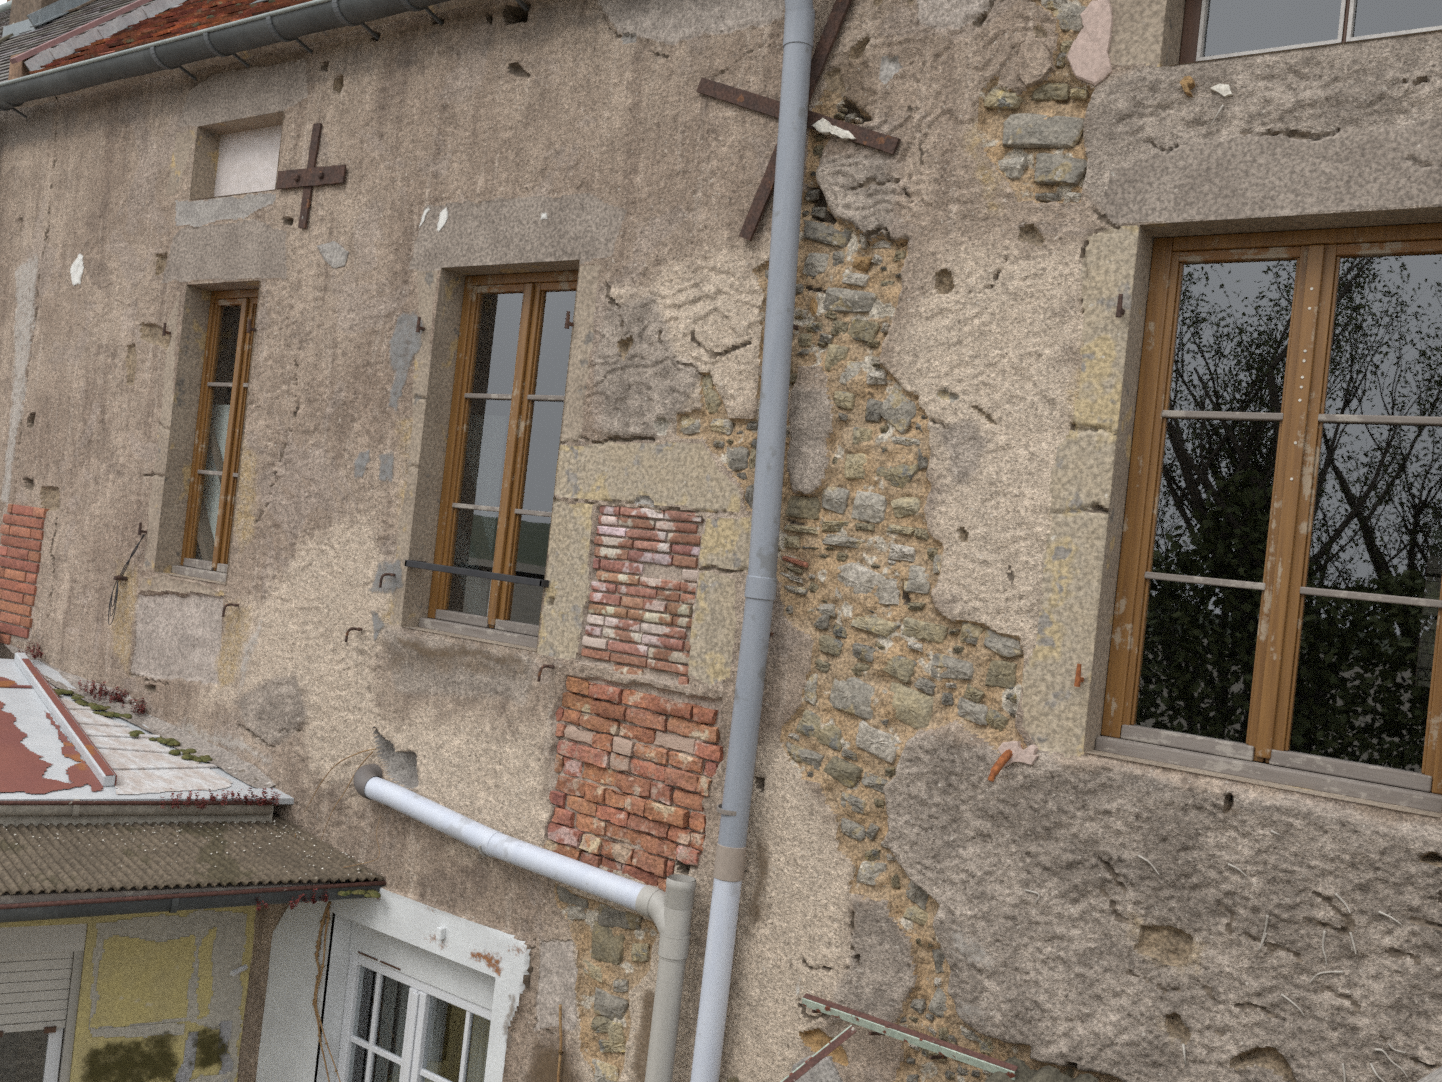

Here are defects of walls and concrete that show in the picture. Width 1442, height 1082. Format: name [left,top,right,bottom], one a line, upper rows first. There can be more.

spalling [849,36,872,60]
spalling [879,56,903,84]
spalling [977,0,1113,203]
crack [604,281,624,361]
crack [657,330,752,375]
spalling [653,261,769,511]
spalling [776,89,1124,1082]
water stain [82,1029,227,1082]